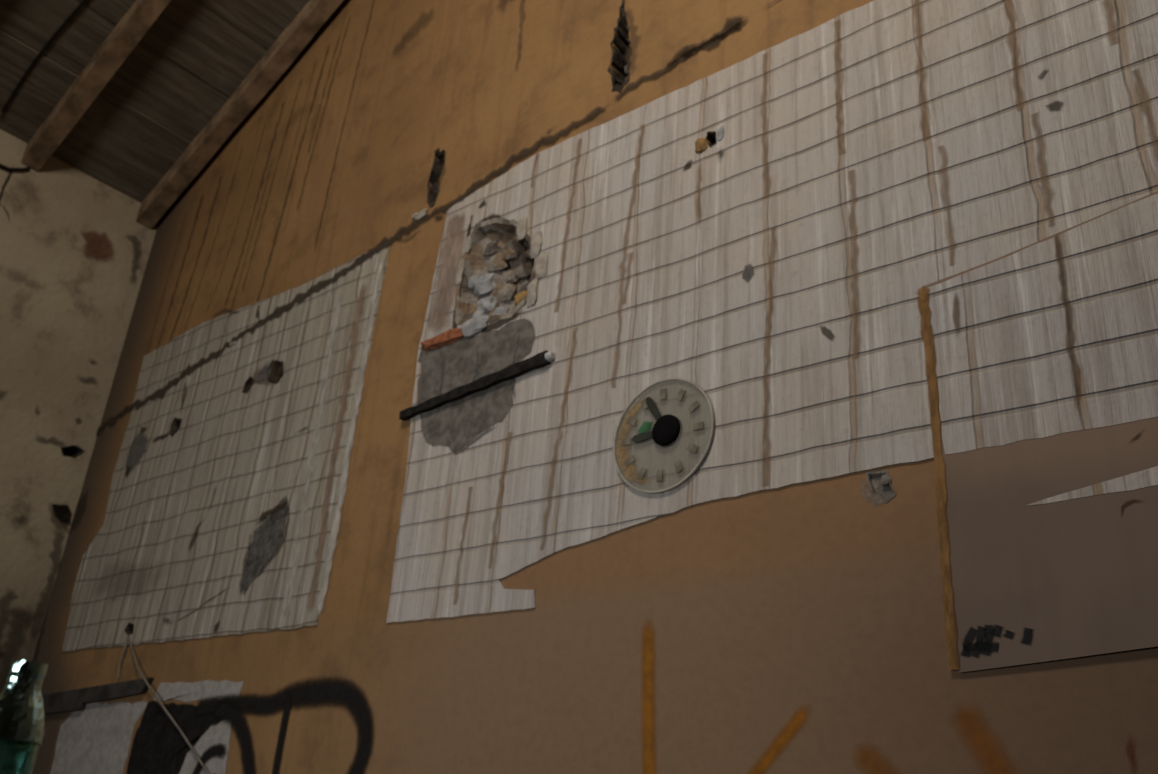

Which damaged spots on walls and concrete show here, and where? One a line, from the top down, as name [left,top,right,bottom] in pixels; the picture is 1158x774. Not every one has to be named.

corrosion [1007,0,1021,111]
spalling [242,360,283,393]
crack [96,0,777,435]
peeling [418,200,548,455]
corrosion [556,140,580,312]
corrosion [619,124,644,315]
corrosion [850,170,858,359]
corrosion [1057,239,1080,404]
peeling [240,497,289,595]
corrosion [917,287,959,670]